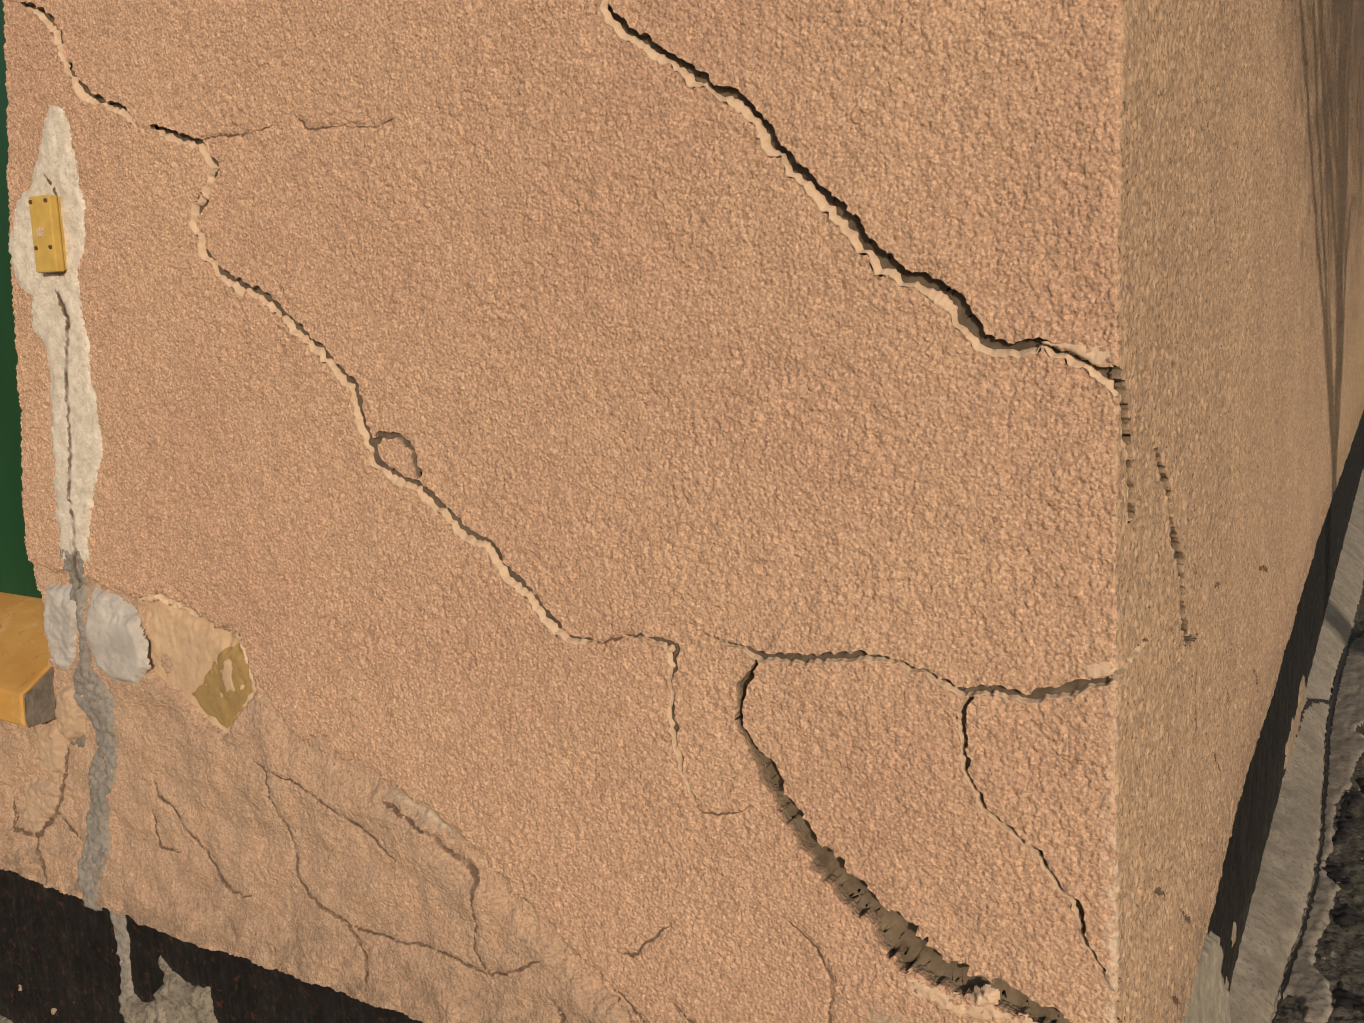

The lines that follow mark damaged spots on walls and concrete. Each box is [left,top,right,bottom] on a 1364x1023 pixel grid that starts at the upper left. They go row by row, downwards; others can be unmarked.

crack [599,0,1133,521]
crack [23,4,749,816]
spalling [140,593,257,733]
peeling [1284,675,1307,769]
crack [13,748,82,882]
crack [153,780,252,898]
crack [255,762,540,992]
crack [624,927,668,958]
crack [761,752,1073,1023]
crack [718,638,1149,970]
spalling [905,975,1038,1023]
crack [1154,888,1191,924]